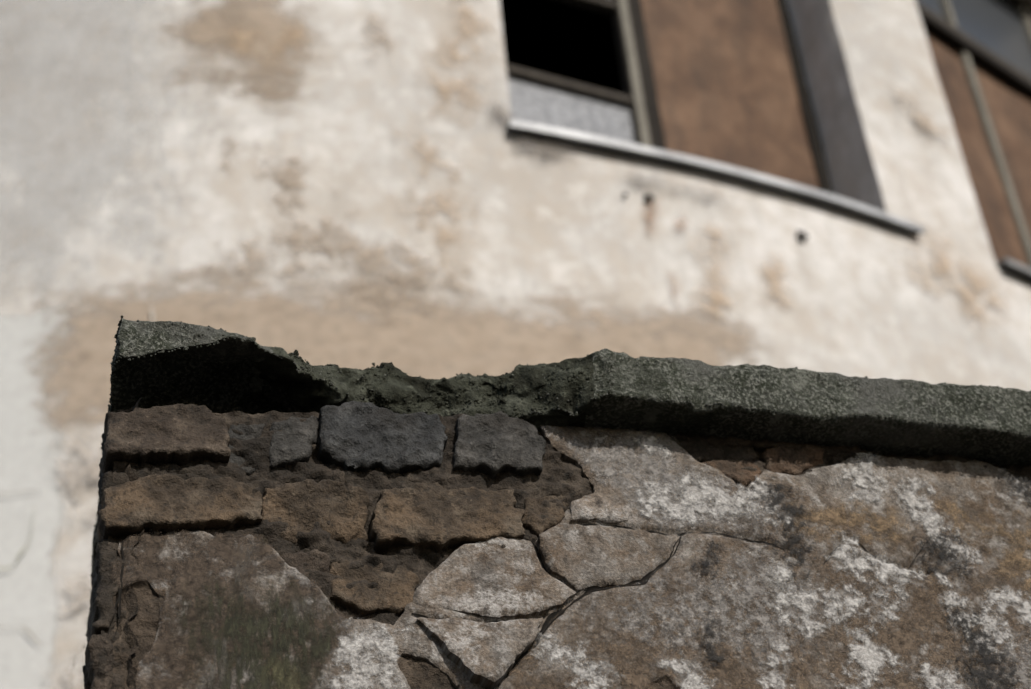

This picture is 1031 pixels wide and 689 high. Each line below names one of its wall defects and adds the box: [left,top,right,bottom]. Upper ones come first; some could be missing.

flaking render [38,267,1031,689]
crack [493,523,785,689]